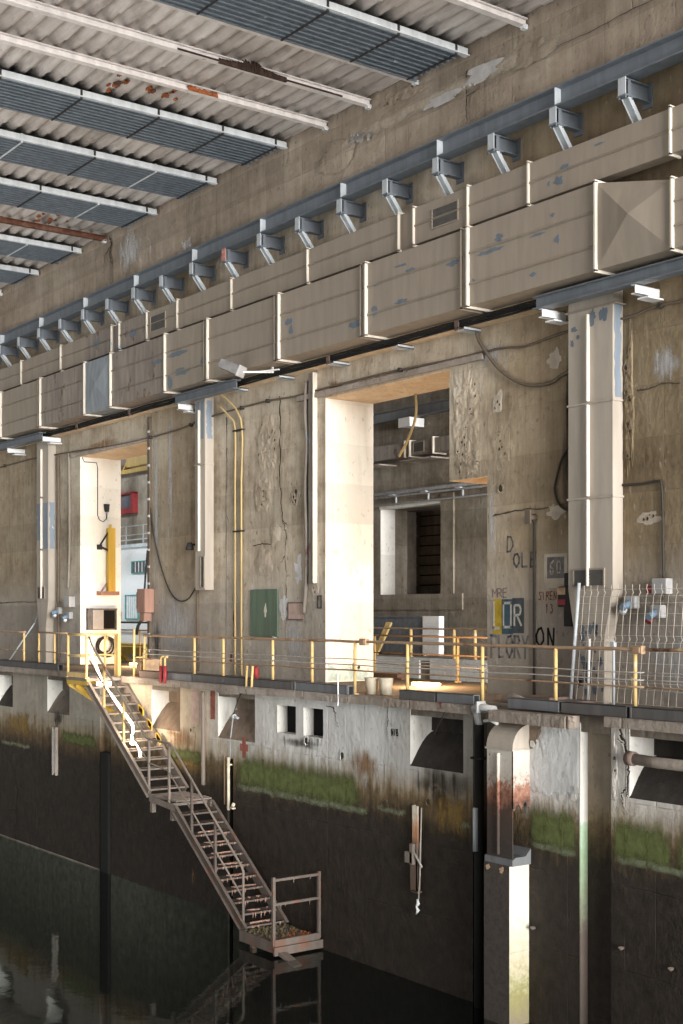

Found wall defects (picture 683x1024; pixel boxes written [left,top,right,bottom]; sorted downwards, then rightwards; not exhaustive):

corrosion [106,74,130,93]
corrosion [145,85,218,101]
peeling [423,57,505,110]
crack [253,396,287,636]
crack [617,728,630,809]